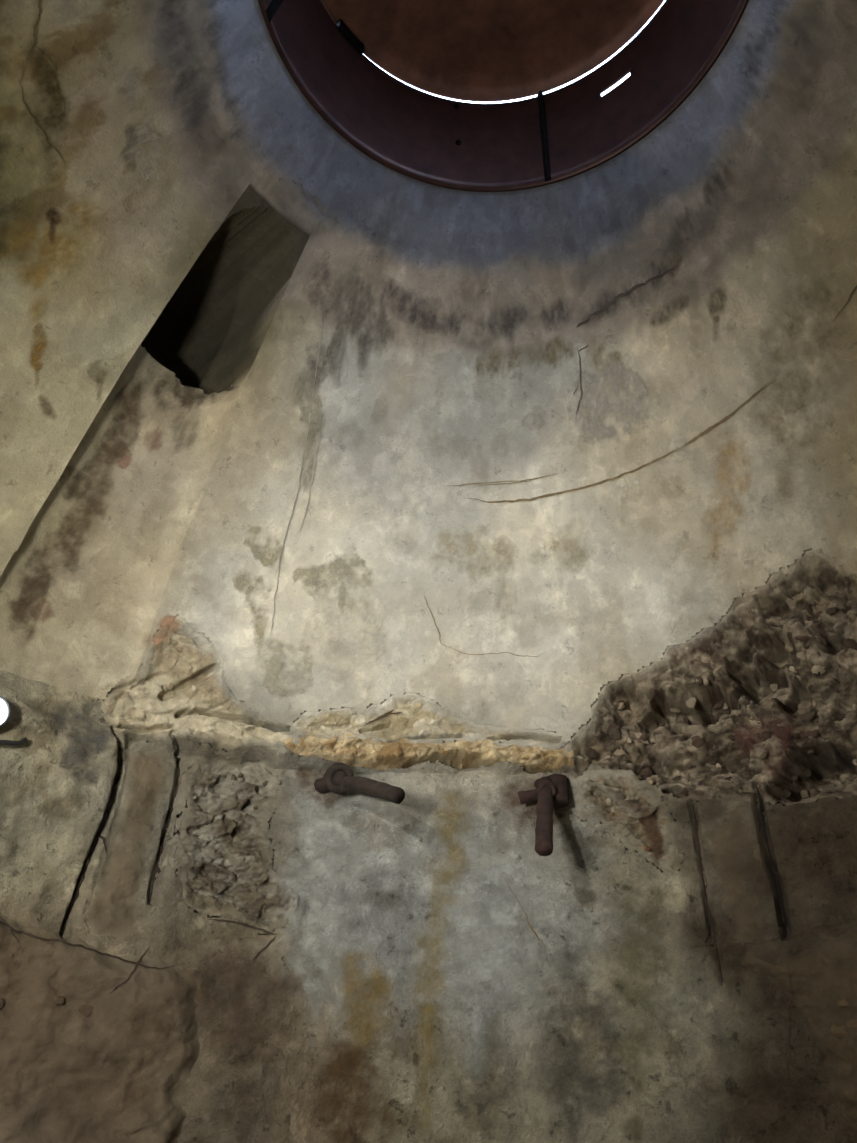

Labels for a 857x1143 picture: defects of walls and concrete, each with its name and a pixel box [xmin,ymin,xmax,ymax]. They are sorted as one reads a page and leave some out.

damp [31,326,46,369]
damp [155,377,229,404]
damp [298,270,390,424]
crack [573,265,678,418]
damp [11,383,141,639]
spalling [101,548,857,934]
damp [285,804,387,1035]
damp [443,874,518,1000]